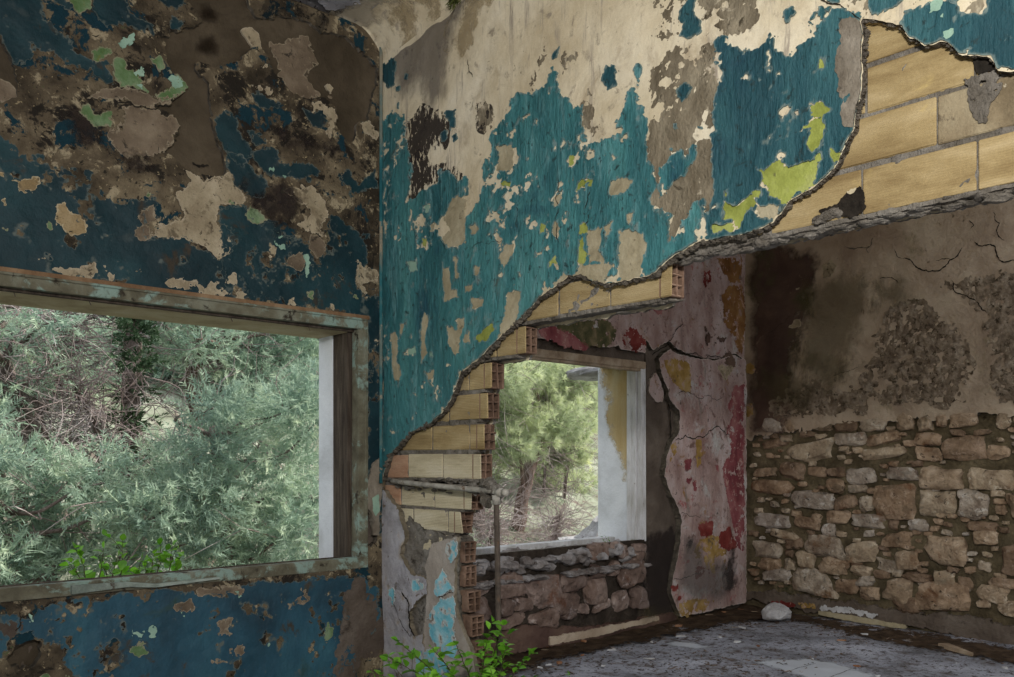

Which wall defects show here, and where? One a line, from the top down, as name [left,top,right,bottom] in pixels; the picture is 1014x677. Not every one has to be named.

peeling [0,0,379,354]
crack [879,213,1012,312]
peeling [337,0,1014,640]
crack [652,324,730,359]
peeling [0,574,395,677]
peeling [414,568,459,677]